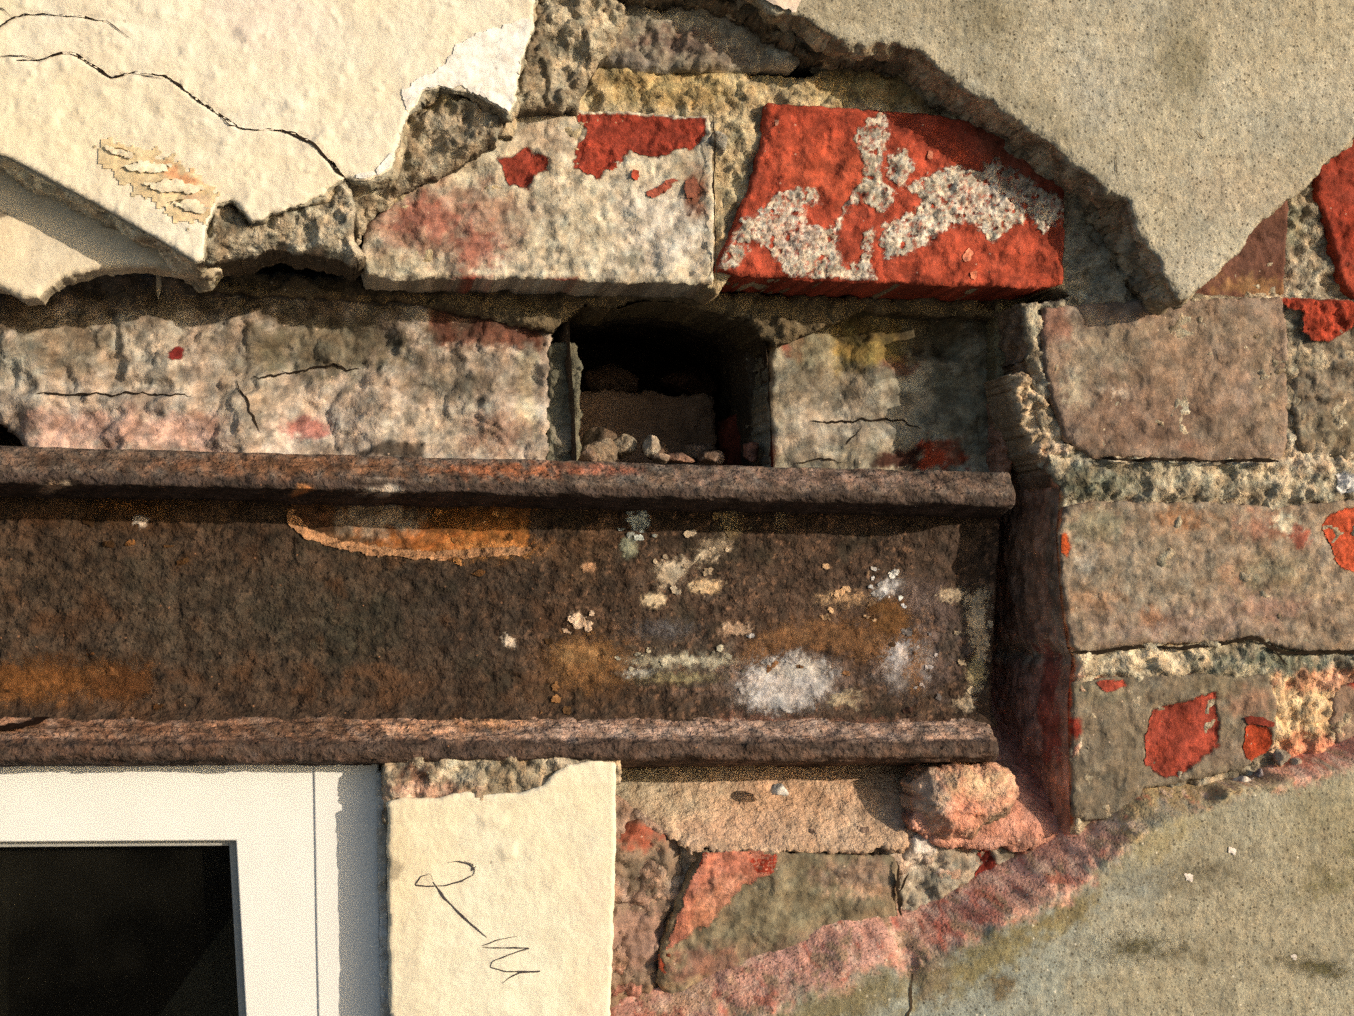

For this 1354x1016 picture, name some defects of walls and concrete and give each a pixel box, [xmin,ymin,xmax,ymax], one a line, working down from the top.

crack [0,8,349,182]
spalling [94,0,905,281]
peeling [719,112,1064,281]
spalling [1282,297,1354,342]
spalling [551,301,731,461]
peeling [286,509,532,561]
rust [430,508,534,577]
rust [0,652,163,710]
rust [540,617,636,715]
rust [741,594,929,690]
spalling [1145,692,1220,778]
spalling [658,850,777,973]